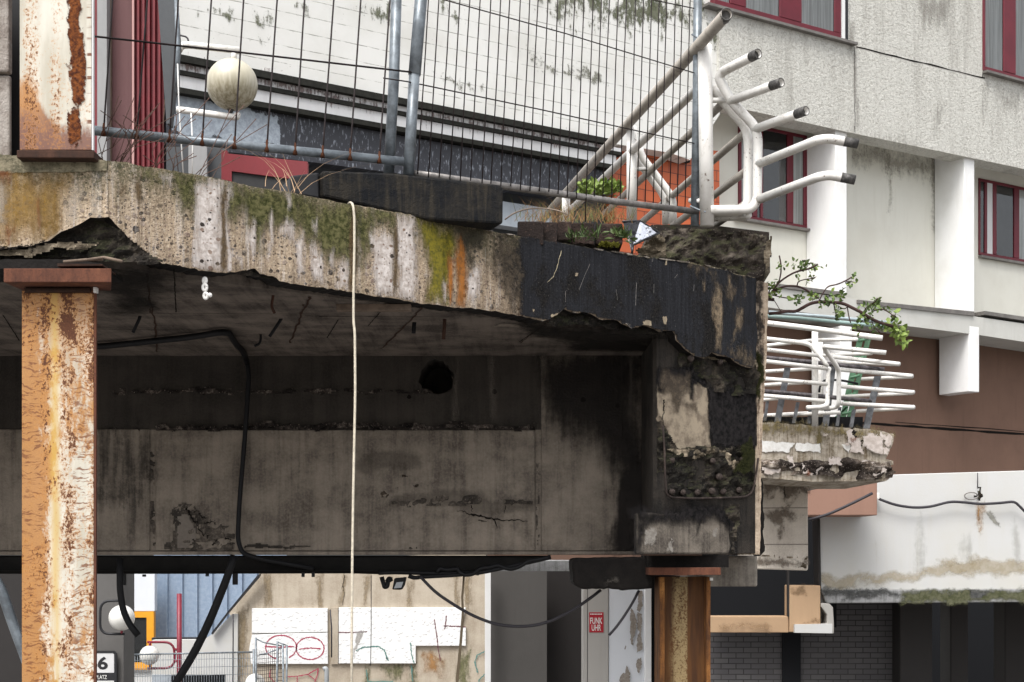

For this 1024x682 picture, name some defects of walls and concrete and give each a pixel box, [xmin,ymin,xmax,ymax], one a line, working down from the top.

rust [66,0,86,147]
spalling [0,220,163,265]
water stain [192,179,358,288]
water stain [370,214,529,332]
rust [447,235,468,307]
spalling [545,311,667,333]
spalling [592,248,760,396]
spalling [656,422,896,500]
spalling [150,501,311,551]
crack [460,505,524,526]
water stain [821,559,1024,600]